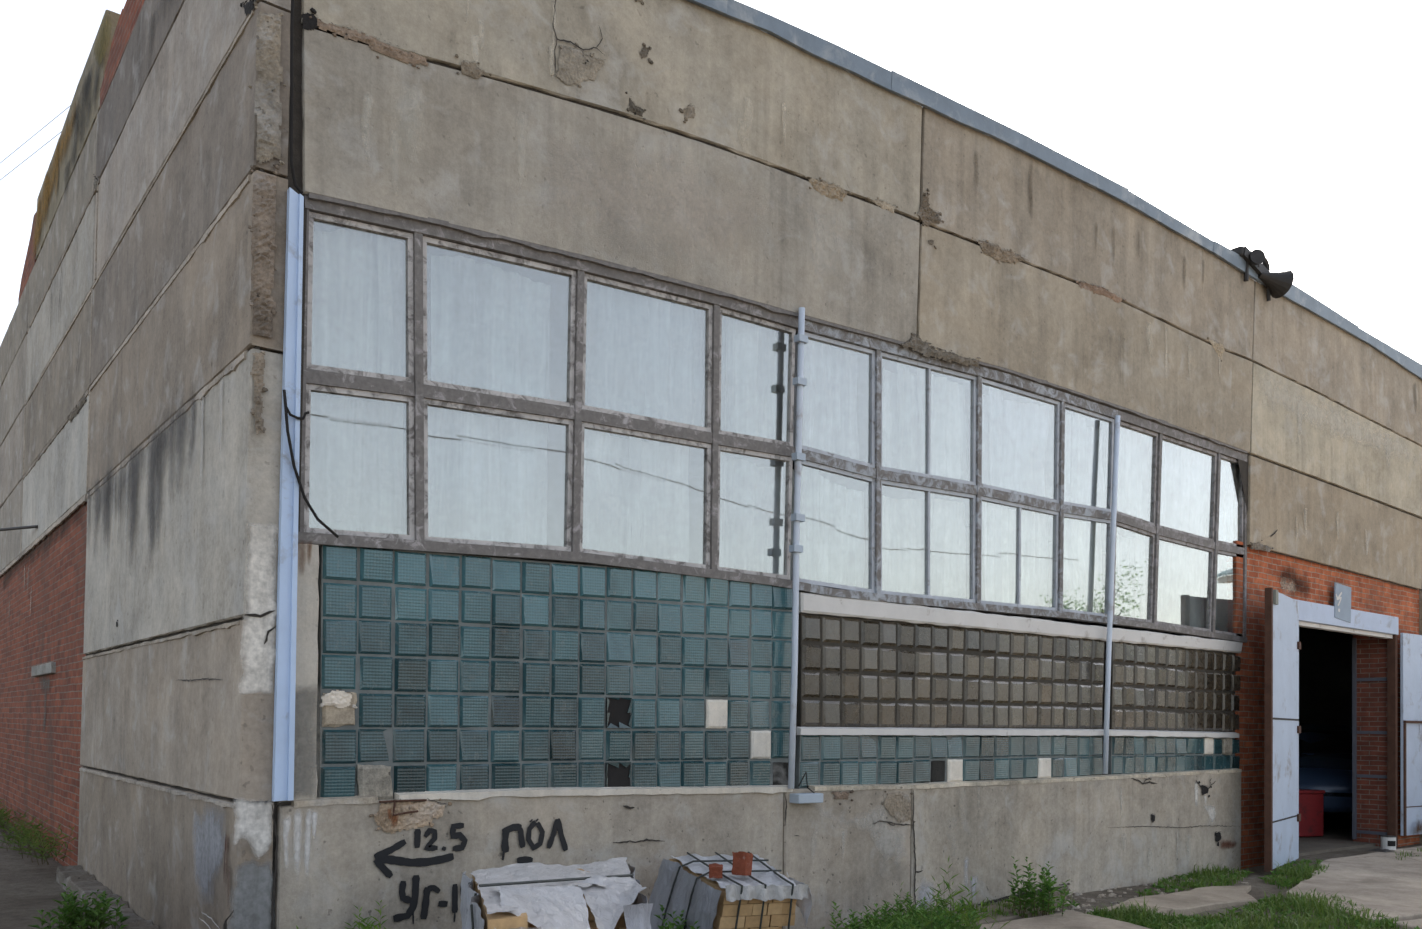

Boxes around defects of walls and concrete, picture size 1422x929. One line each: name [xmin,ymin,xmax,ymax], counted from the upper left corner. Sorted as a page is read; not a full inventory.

spalling [301,8,429,69]
spalling [455,54,492,79]
damp [38,69,97,235]
spalling [804,176,852,202]
spalling [240,0,286,435]
spalling [915,188,944,249]
spalling [972,237,1029,264]
spalling [1076,280,1126,303]
peeling [239,526,277,693]
spalling [319,689,358,709]
peeling [235,800,272,856]
spalling [369,798,452,834]